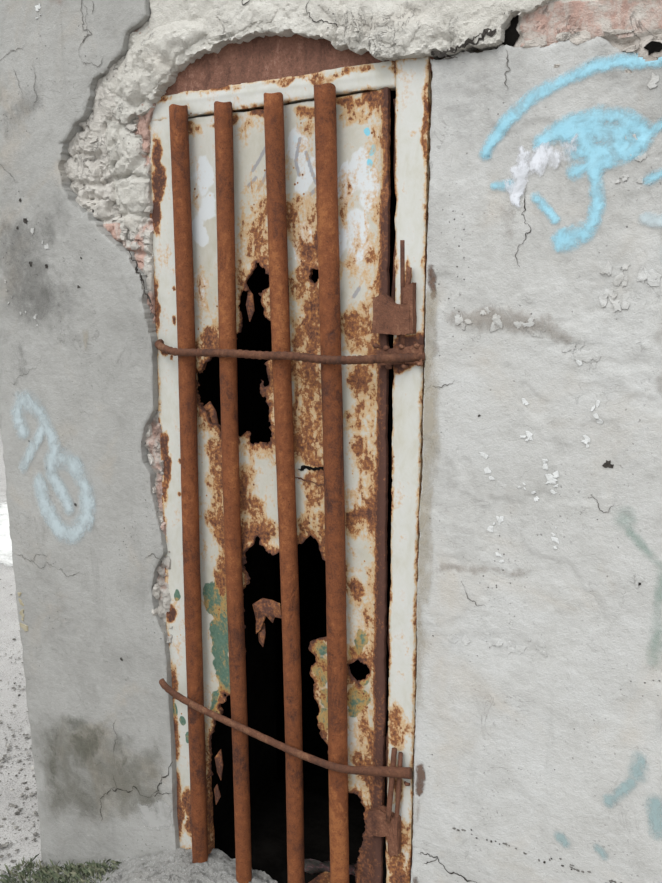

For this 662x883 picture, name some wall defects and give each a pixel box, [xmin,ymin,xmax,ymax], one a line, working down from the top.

crack [78,0,102,67]
crack [431,28,510,87]
spalling [502,0,662,61]
spalling [64,63,156,323]
spalling [145,411,166,535]
spalling [152,551,173,643]
crack [100,763,172,819]
leakage [140,801,172,830]
corrosion [416,764,425,796]
crack [421,852,477,883]